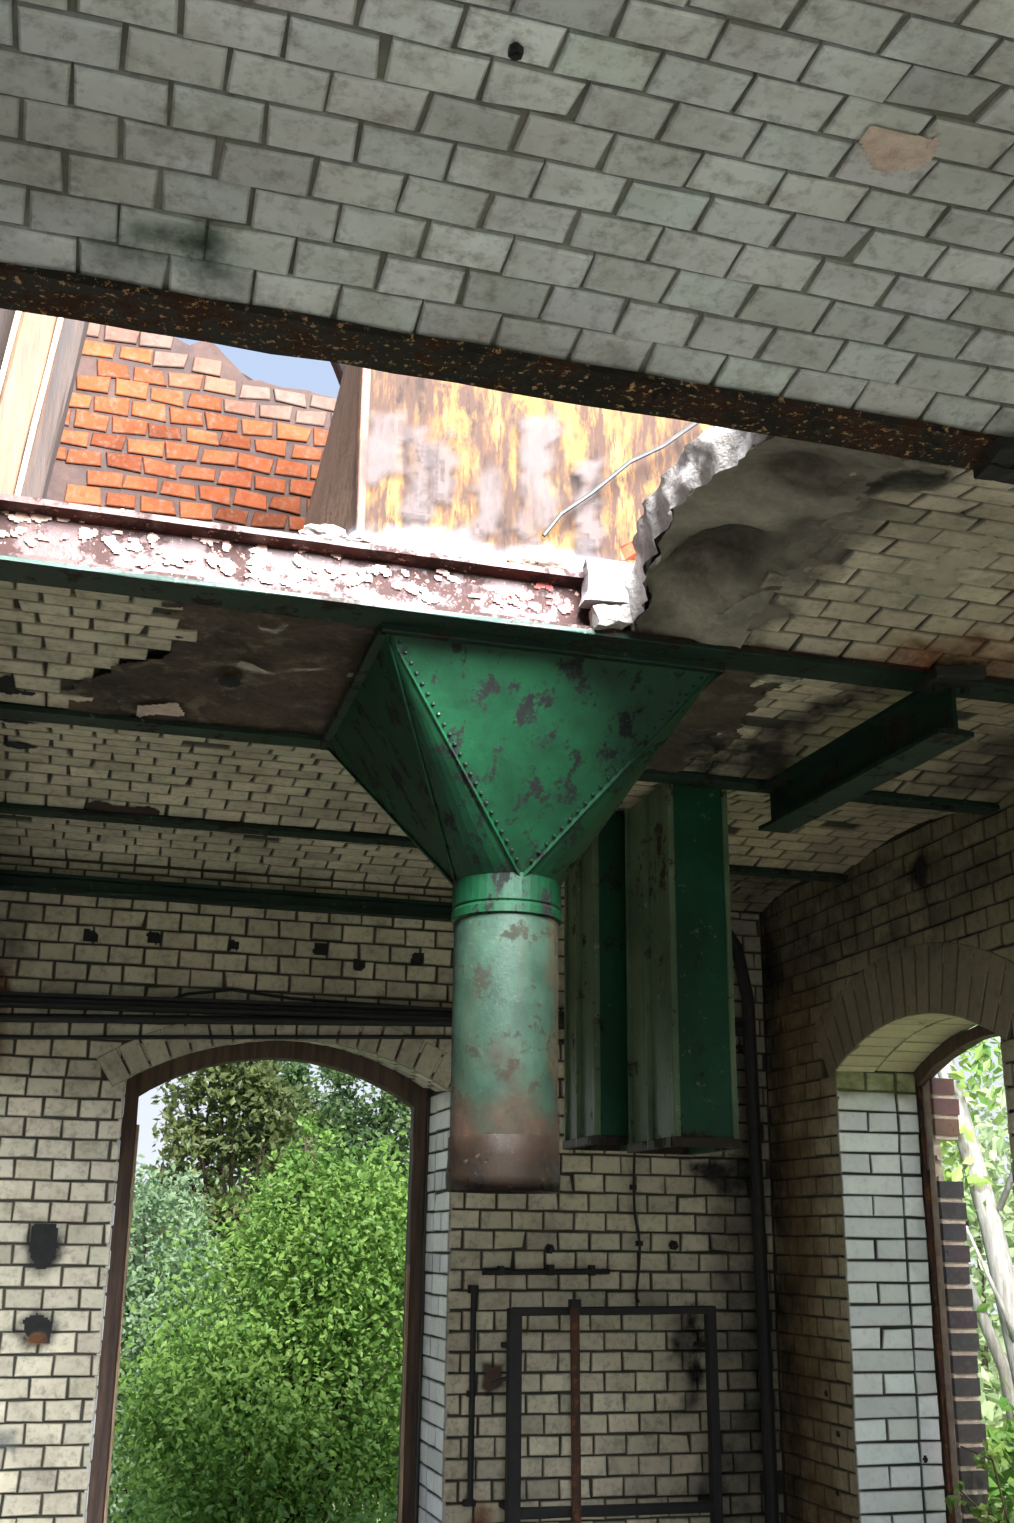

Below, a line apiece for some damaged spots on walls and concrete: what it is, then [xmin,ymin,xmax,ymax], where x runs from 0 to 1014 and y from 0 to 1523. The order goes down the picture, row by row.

spalling [858,126,942,174]
damp [865,472,946,494]
spalling [68,602,377,736]
damp [686,685,874,775]